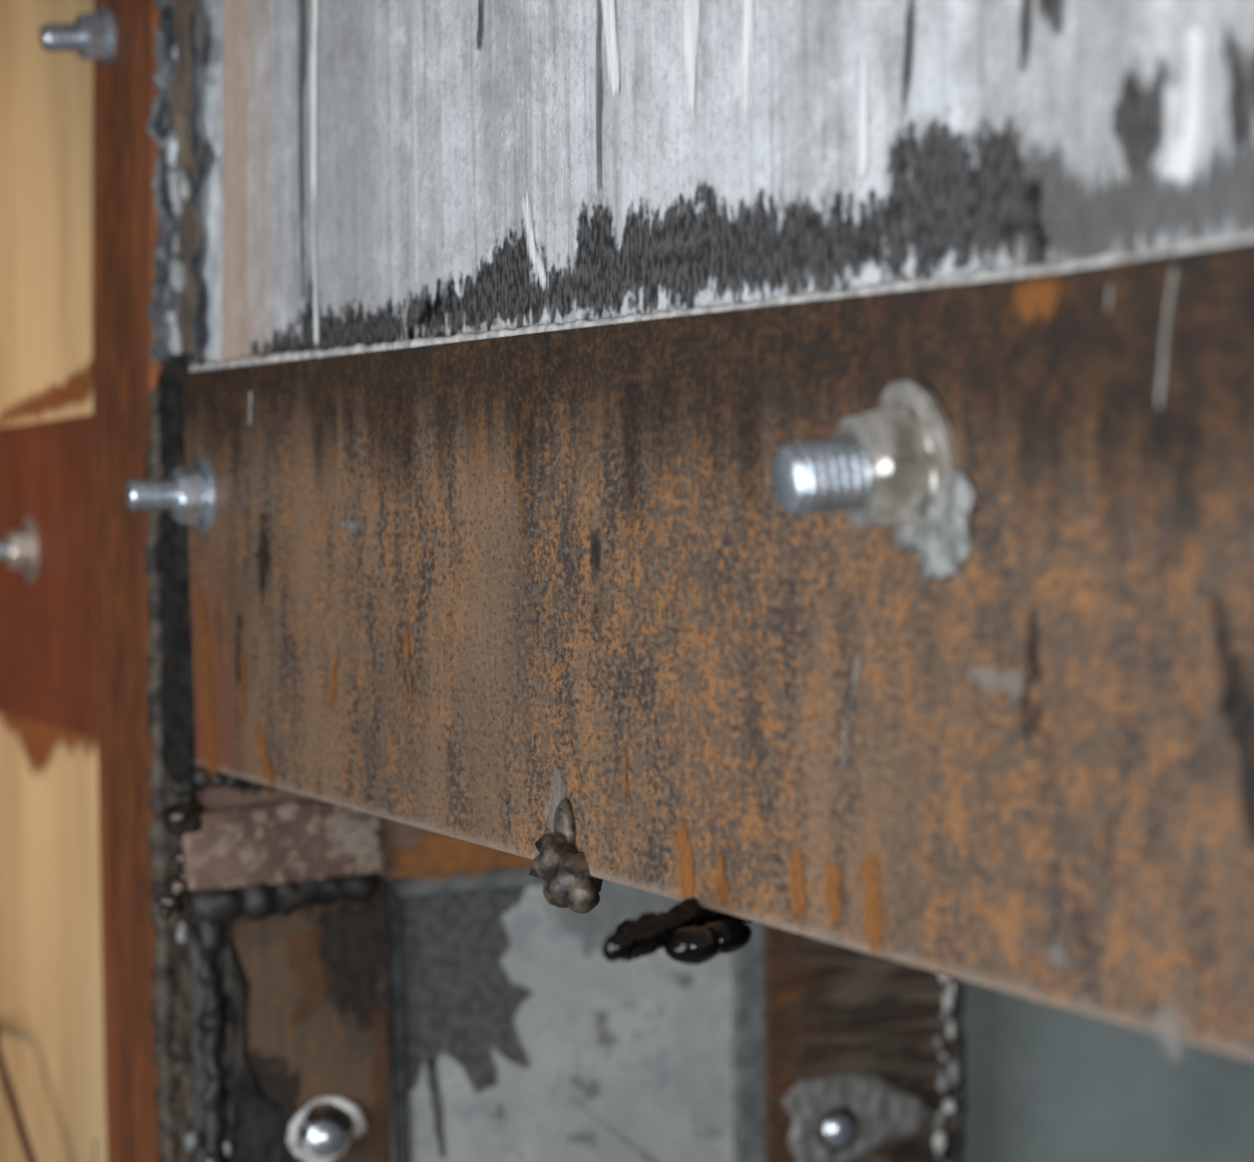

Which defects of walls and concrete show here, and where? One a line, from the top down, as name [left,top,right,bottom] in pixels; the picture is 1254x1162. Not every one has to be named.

spalling [1037,0,1061,35]
spalling [1112,57,1173,176]
spalling [1222,21,1254,151]
rust [1017,274,1059,323]
leakage [255,513,269,618]
leakage [590,529,599,579]
leakage [1020,611,1041,740]
leakage [1210,597,1254,845]
rust [388,835,532,881]
rust [674,826,694,901]
rust [860,856,883,953]
peeling [400,886,532,1158]